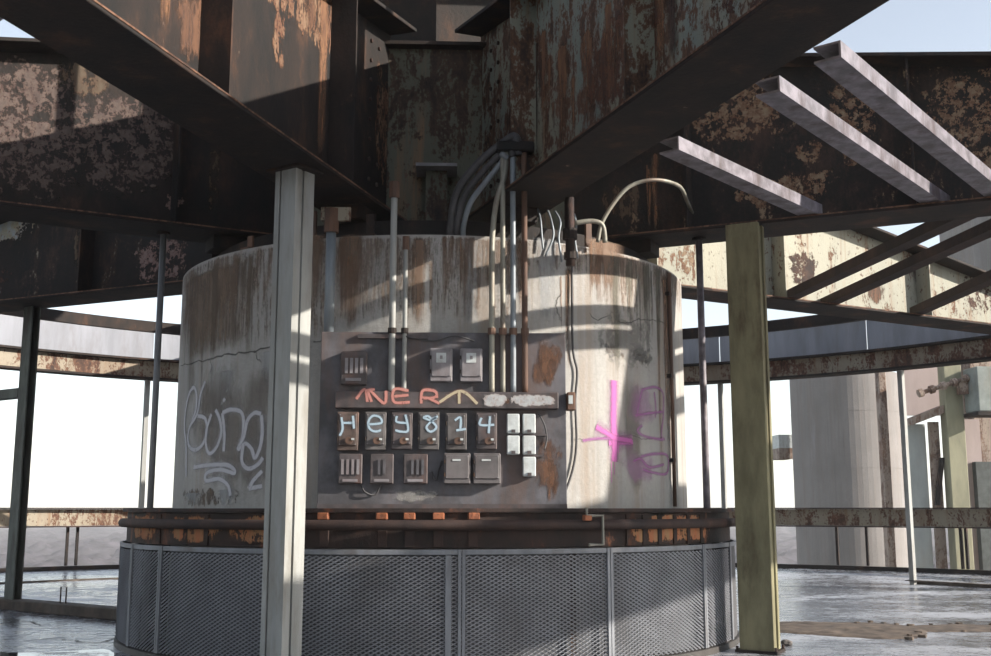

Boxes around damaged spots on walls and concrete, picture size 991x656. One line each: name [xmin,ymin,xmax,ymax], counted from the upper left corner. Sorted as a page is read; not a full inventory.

rust [307,0,328,148]
leakage [412,239,426,316]
leakage [464,239,479,293]
leakage [538,239,554,293]
leakage [187,256,254,358]
leakage [614,257,660,354]
crack [181,347,270,372]
rust [533,342,562,386]
rust [169,515,264,544]
rust [631,514,706,543]